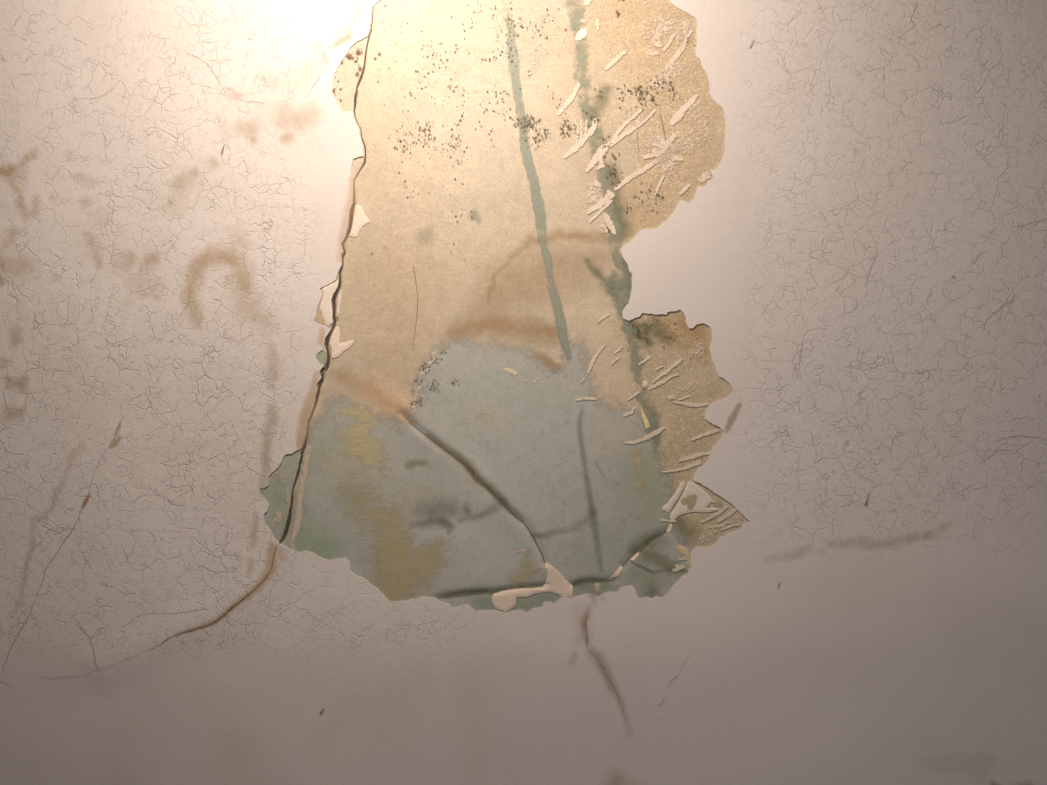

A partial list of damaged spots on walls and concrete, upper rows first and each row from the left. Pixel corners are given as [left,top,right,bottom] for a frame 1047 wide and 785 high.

leakage [341,18,417,76]
leakage [386,0,680,198]
leakage [601,135,664,221]
peeling [260,0,750,613]
leakage [410,349,460,408]
crack [430,438,545,563]
crack [3,493,90,667]
crack [444,589,492,597]
crack [572,578,608,586]